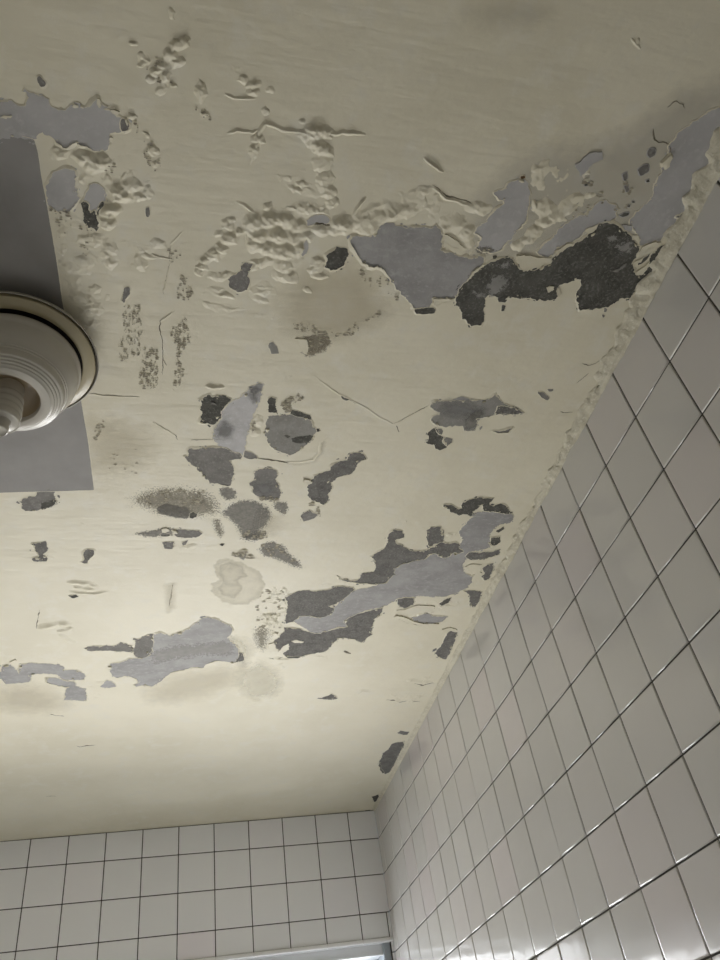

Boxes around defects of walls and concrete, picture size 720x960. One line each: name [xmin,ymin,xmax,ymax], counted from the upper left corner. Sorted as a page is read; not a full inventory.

flaking render [0,74,160,389]
flaking render [301,106,720,328]
peeling [268,341,279,354]
flaking render [0,400,94,511]
water stain [132,486,301,568]
peeling [183,382,321,503]
flaking render [300,450,368,522]
peeling [425,392,525,451]
flaking render [260,496,515,669]
peeling [0,616,245,701]
peeling [378,730,410,774]